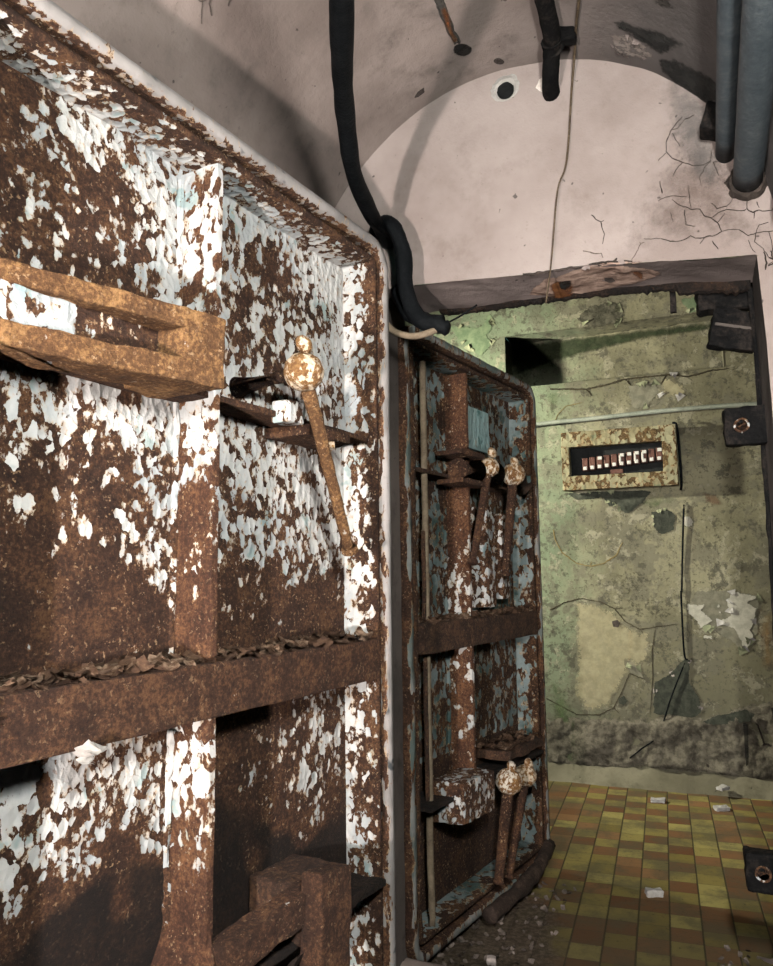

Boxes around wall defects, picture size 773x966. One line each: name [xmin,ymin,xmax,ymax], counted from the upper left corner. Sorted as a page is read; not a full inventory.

crack [198,0,231,24]
leakage [616,21,679,53]
crack [523,115,773,276]
peeling [687,589,763,655]
rust [0,628,373,693]
spalling [546,603,773,779]